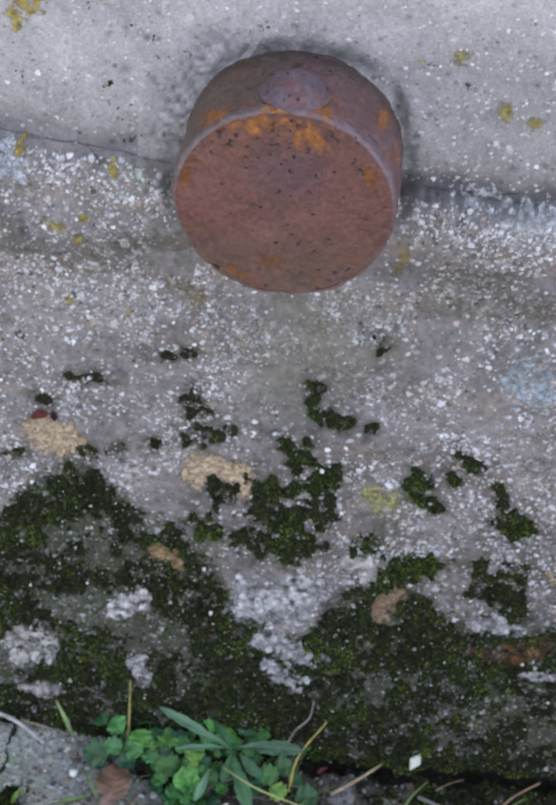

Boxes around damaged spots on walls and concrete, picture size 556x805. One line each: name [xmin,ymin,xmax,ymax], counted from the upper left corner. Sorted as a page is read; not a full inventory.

crack [0,723,17,772]